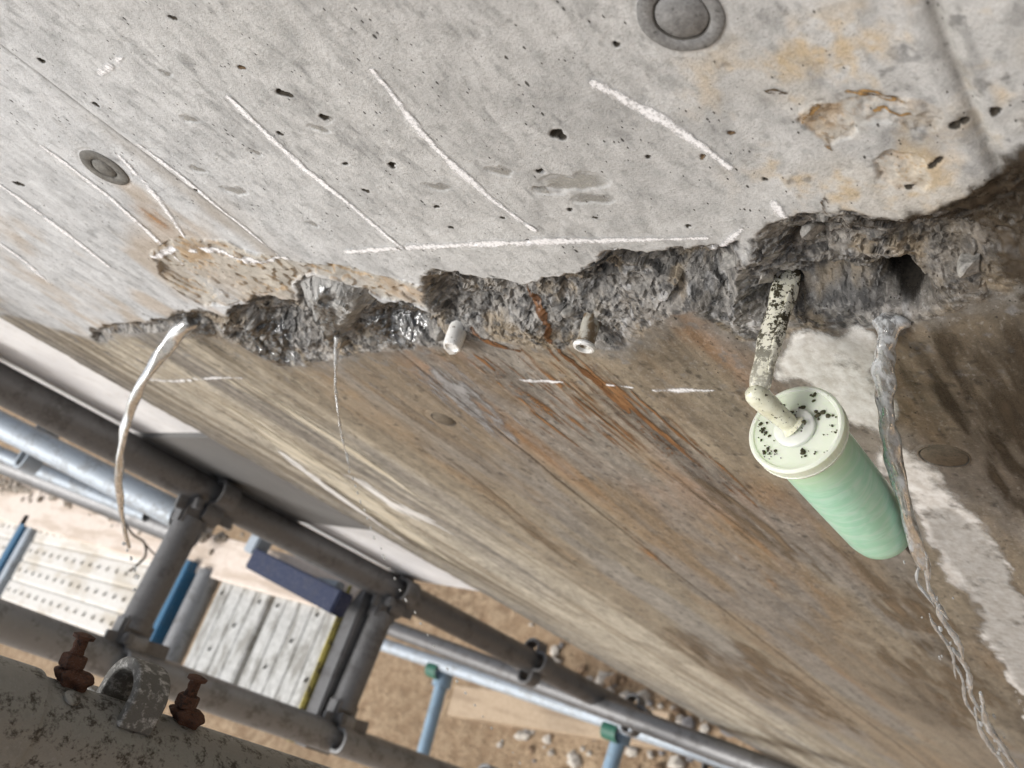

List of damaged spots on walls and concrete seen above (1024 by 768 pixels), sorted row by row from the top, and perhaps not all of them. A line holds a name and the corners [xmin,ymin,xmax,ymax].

peeling [875,149,943,192]
spalling [151,168,1024,368]
corrosion [470,287,756,506]
water stain [775,326,879,431]
water stain [877,452,888,476]
water stain [931,330,1024,513]
water stain [855,562,1002,729]
water stain [902,448,1024,719]